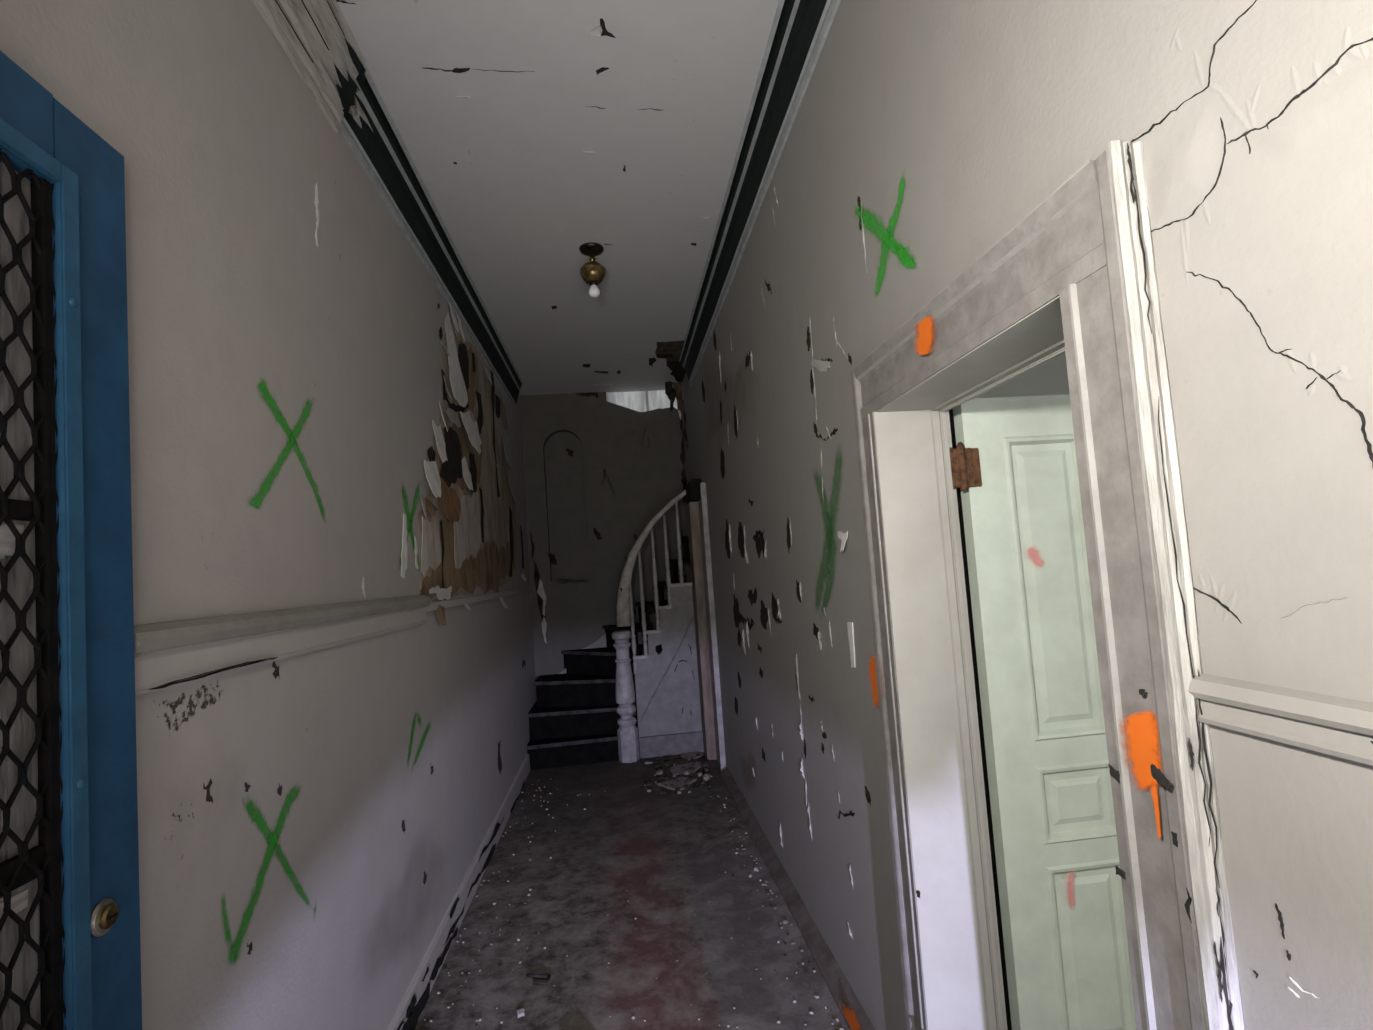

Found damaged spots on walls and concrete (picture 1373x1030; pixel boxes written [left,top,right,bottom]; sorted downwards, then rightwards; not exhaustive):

peeling [334,37,374,133]
crack [1127,0,1373,470]
peeling [401,303,557,643]
peeling [576,364,679,421]
spalling [649,354,686,383]
peeling [702,331,753,479]
peeling [725,519,782,678]
flaking render [813,607,856,668]
peeling [838,531,848,551]
peeling [795,653,835,842]
crack [1158,400,1242,1030]